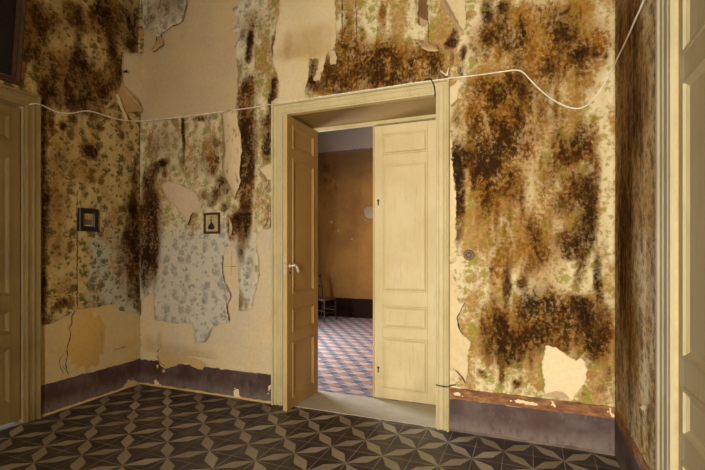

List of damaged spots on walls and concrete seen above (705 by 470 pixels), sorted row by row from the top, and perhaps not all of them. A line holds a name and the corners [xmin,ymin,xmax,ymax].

water stain [27,0,138,323]
water stain [121,136,168,302]
peeling [41,205,271,386]
peeling [104,0,242,199]
peeling [161,182,201,224]
water stain [200,75,278,262]
water stain [240,15,256,67]
peeling [271,0,337,104]
water stain [305,0,648,386]
peeling [542,345,588,407]